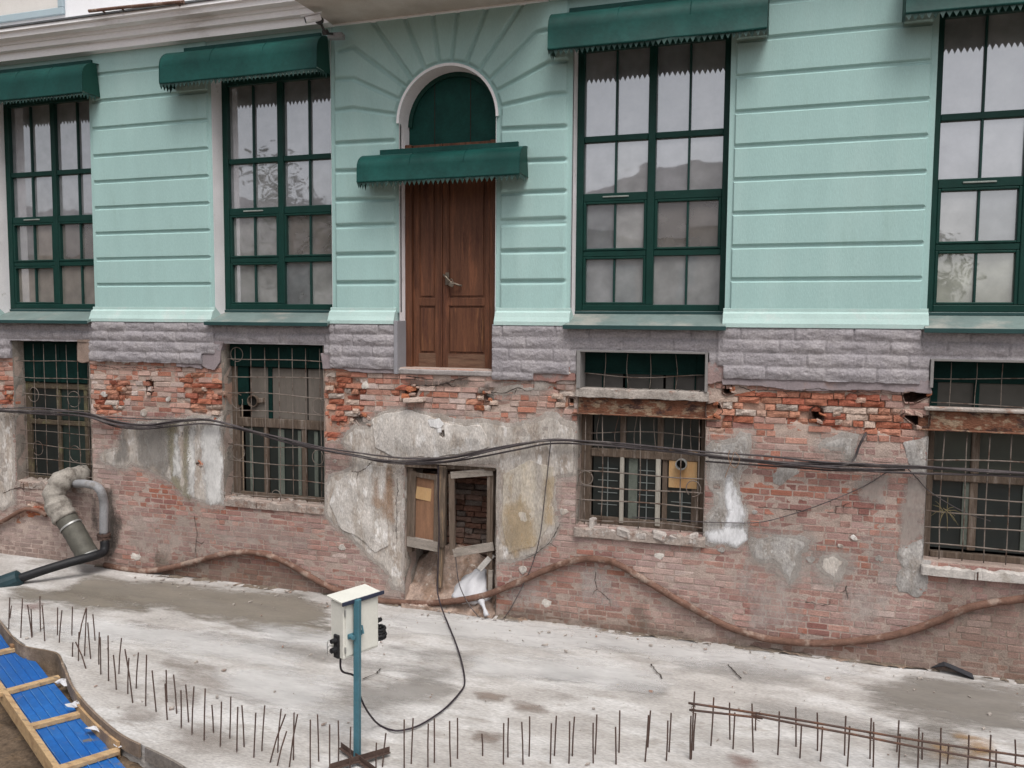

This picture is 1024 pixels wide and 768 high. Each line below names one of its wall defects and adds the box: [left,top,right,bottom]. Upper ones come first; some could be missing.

spalling [93,380,132,415]
peeling [100,373,228,507]
peeling [323,371,578,592]
water stain [706,477,747,547]
spalling [616,385,932,584]
peeling [895,539,931,598]